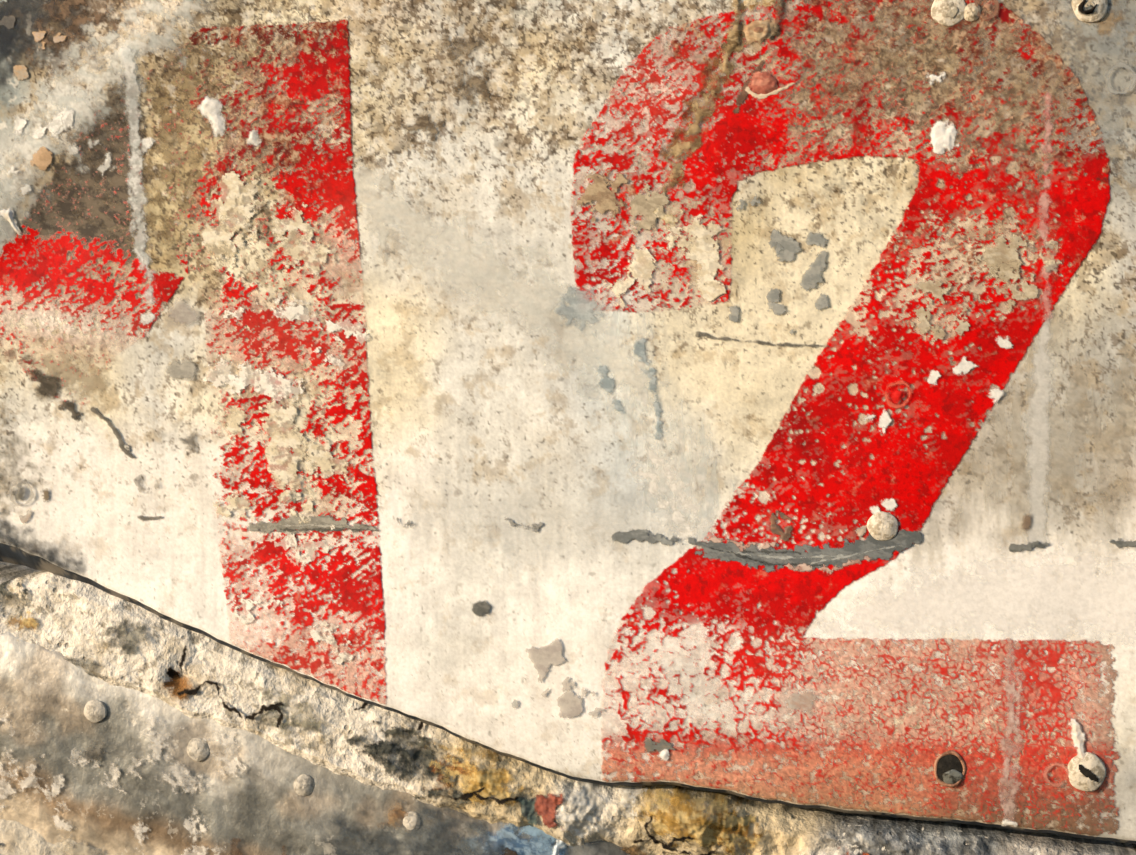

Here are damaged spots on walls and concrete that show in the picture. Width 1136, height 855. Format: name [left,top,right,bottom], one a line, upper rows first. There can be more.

peeling [201,164,266,267]
peeling [272,202,335,276]
peeling [769,229,828,310]
peeling [966,235,1062,311]
peeling [271,294,370,376]
peeling [927,356,977,385]
peeling [996,336,1012,348]
peeling [864,410,892,433]
peeling [203,355,348,571]
peeling [856,498,897,537]
corrosion [164,667,190,700]
crack [178,646,283,728]